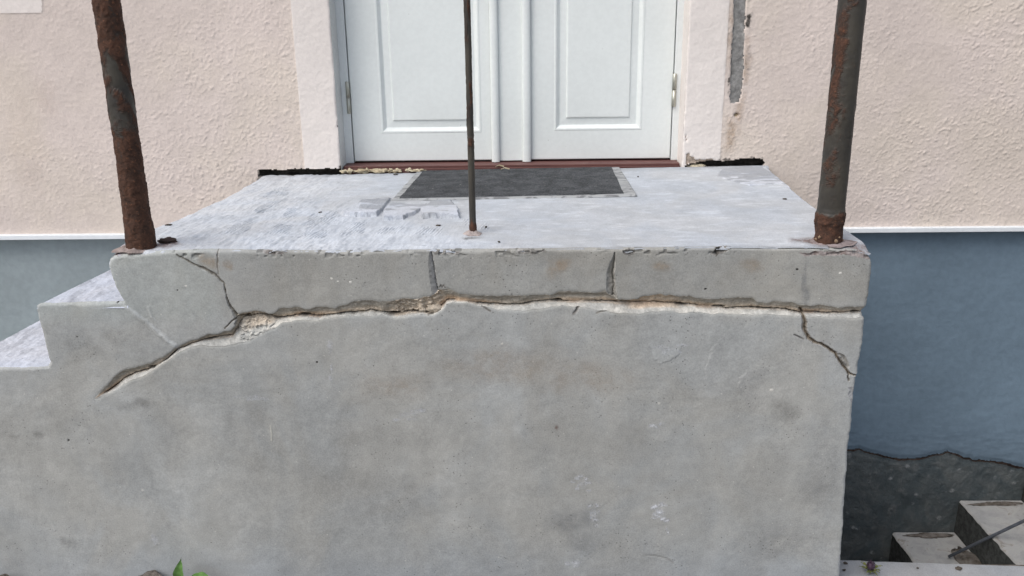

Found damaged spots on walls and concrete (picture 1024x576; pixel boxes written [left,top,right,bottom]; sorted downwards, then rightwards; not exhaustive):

flaking render [729,0,746,103]
crack [96,249,865,398]